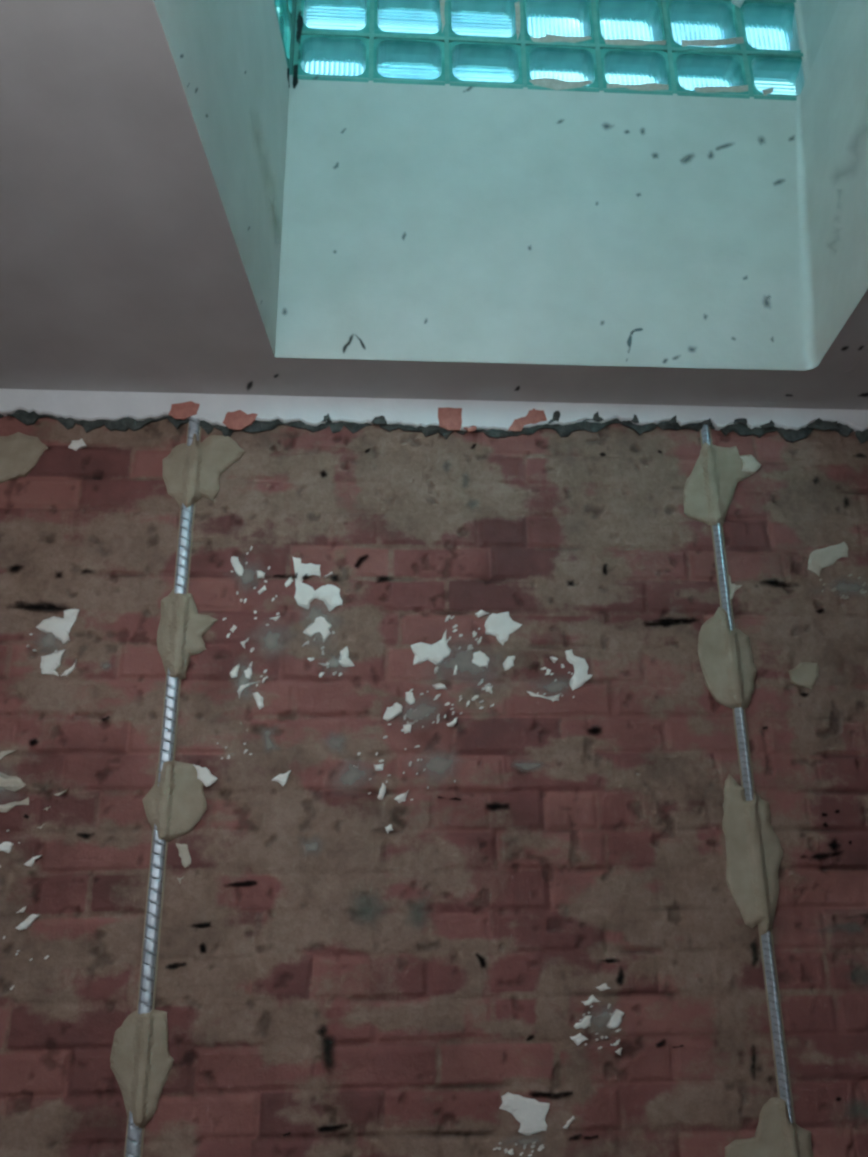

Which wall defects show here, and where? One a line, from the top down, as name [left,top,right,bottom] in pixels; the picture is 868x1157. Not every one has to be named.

spalling [0,401,868,457]
peeling [231,556,266,595]
peeling [285,557,342,647]
peeling [36,609,80,676]
peeling [230,662,264,710]
peeling [383,692,415,734]
peeling [411,629,457,689]
peeling [472,651,489,668]
peeling [475,610,522,671]
peeling [526,649,592,701]
peeling [570,959,624,1046]
peeling [499,1092,550,1135]